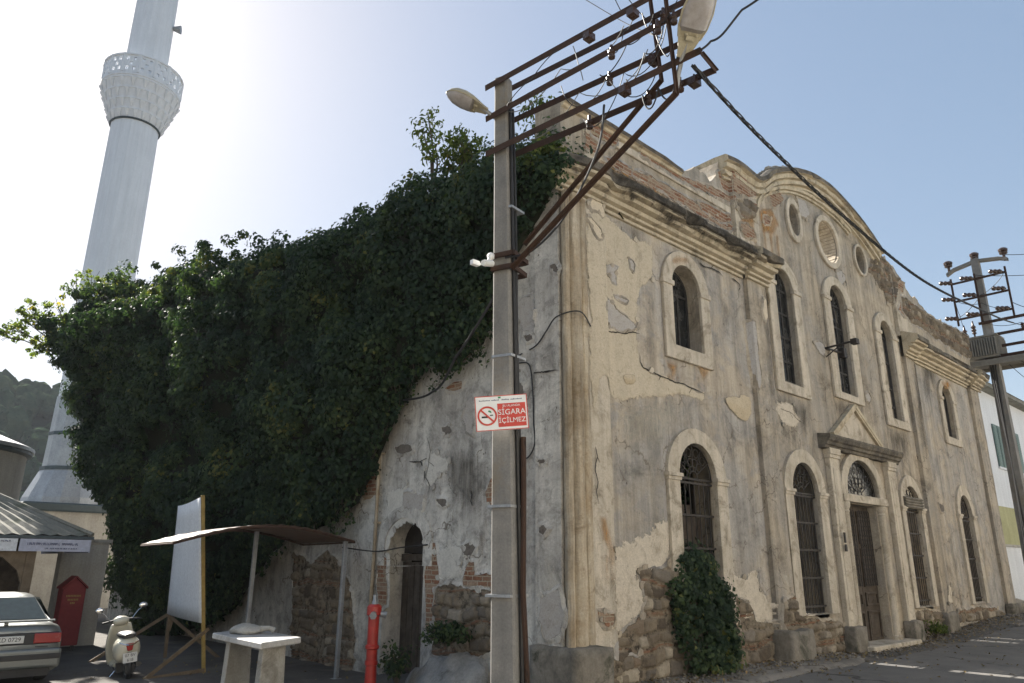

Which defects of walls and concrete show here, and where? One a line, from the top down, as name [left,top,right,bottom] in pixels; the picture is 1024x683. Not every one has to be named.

flaking render [579,118,810,243]
peeling [586,198,705,408]
crack [640,361,705,397]
flaking render [289,547,359,671]
flaking render [375,553,390,611]
flaking render [422,537,491,659]
flaking render [595,558,708,683]